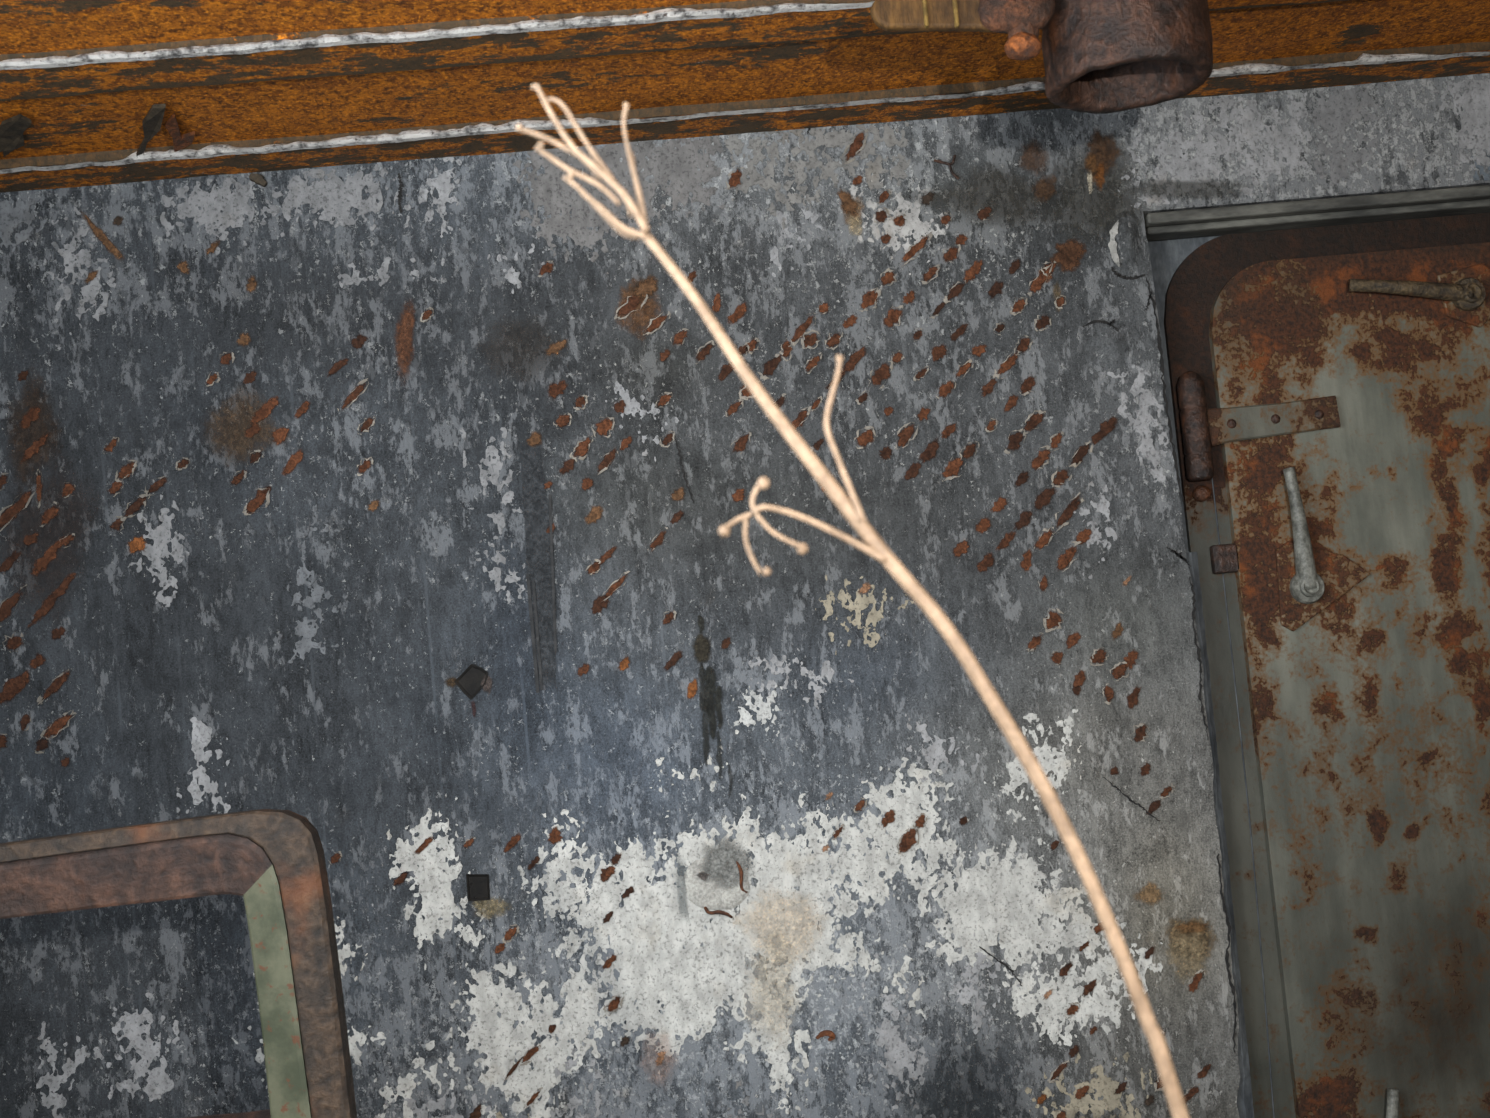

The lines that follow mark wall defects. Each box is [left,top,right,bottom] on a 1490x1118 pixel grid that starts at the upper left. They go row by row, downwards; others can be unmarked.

peeling [1118,92,1344,209]
peeling [1431,79,1490,182]
corrosion [1039,240,1086,282]
water stain [693,615,732,797]
water stain [476,899,505,916]
water stain [1136,883,1161,903]